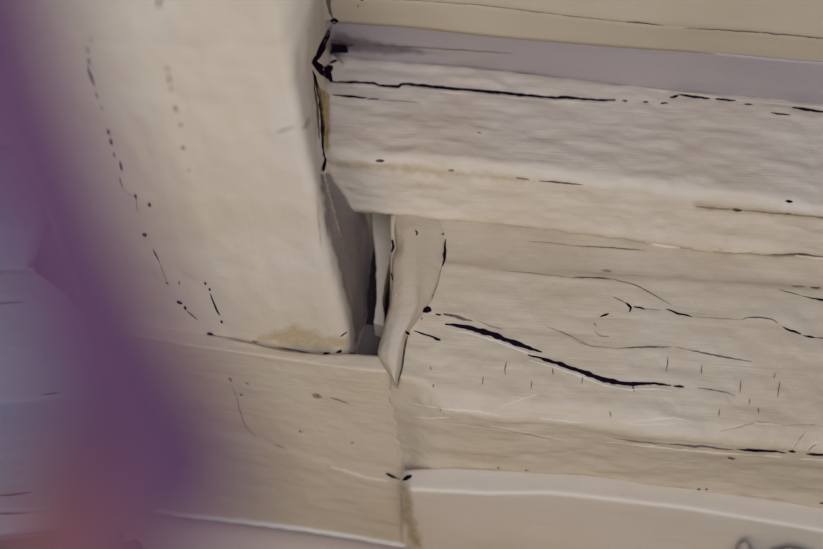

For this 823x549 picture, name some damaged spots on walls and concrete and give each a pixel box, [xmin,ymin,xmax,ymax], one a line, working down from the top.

crack [108,129,223,335]
crack [278,332,356,354]
crack [276,71,823,244]
crack [399,233,752,396]
crack [501,269,823,339]
crack [607,422,823,462]